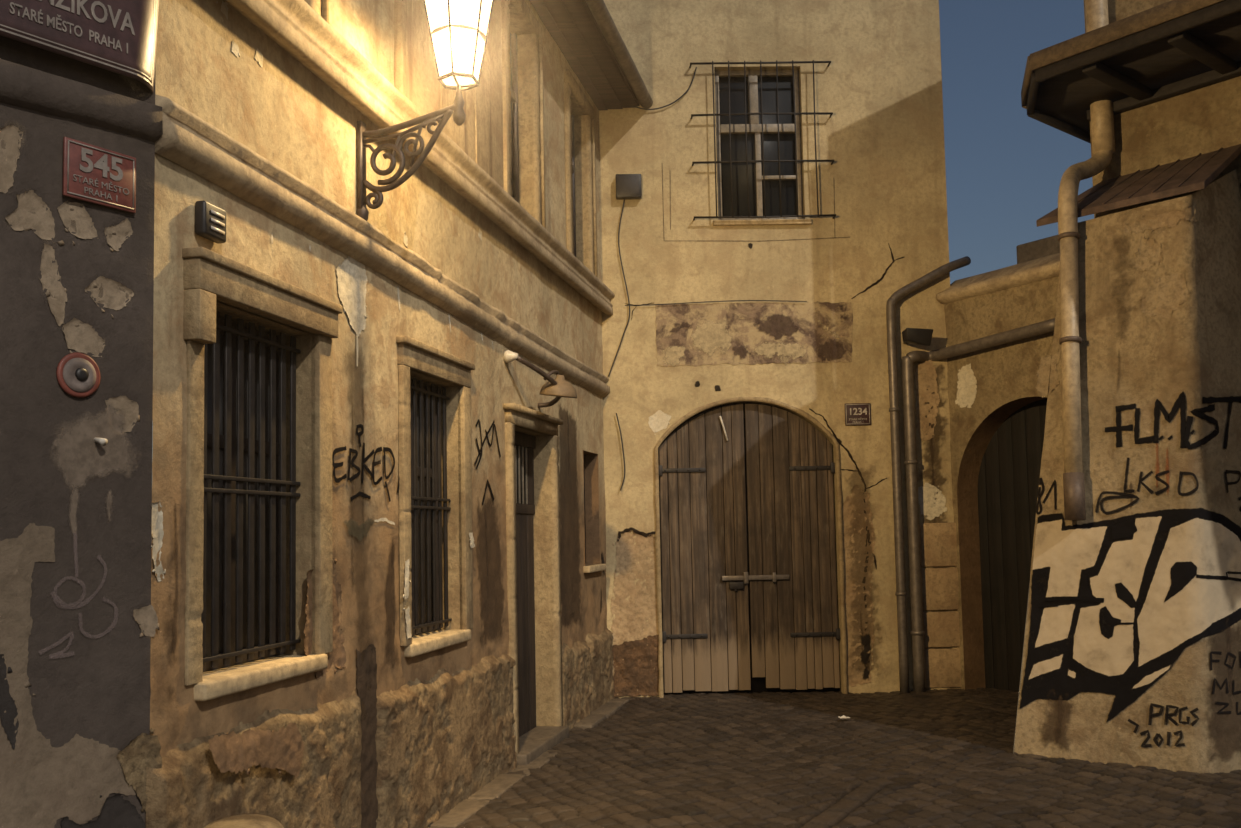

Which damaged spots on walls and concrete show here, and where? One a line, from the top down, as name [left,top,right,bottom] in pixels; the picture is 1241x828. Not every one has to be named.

flaking render [0,125,134,357]
flaking render [336,256,367,367]
crack [851,243,904,299]
crack [617,527,655,541]
crack [809,408,887,647]
flaking render [303,569,314,656]
flaking render [0,523,162,828]
flaking render [314,559,378,828]
flaking render [208,722,304,778]